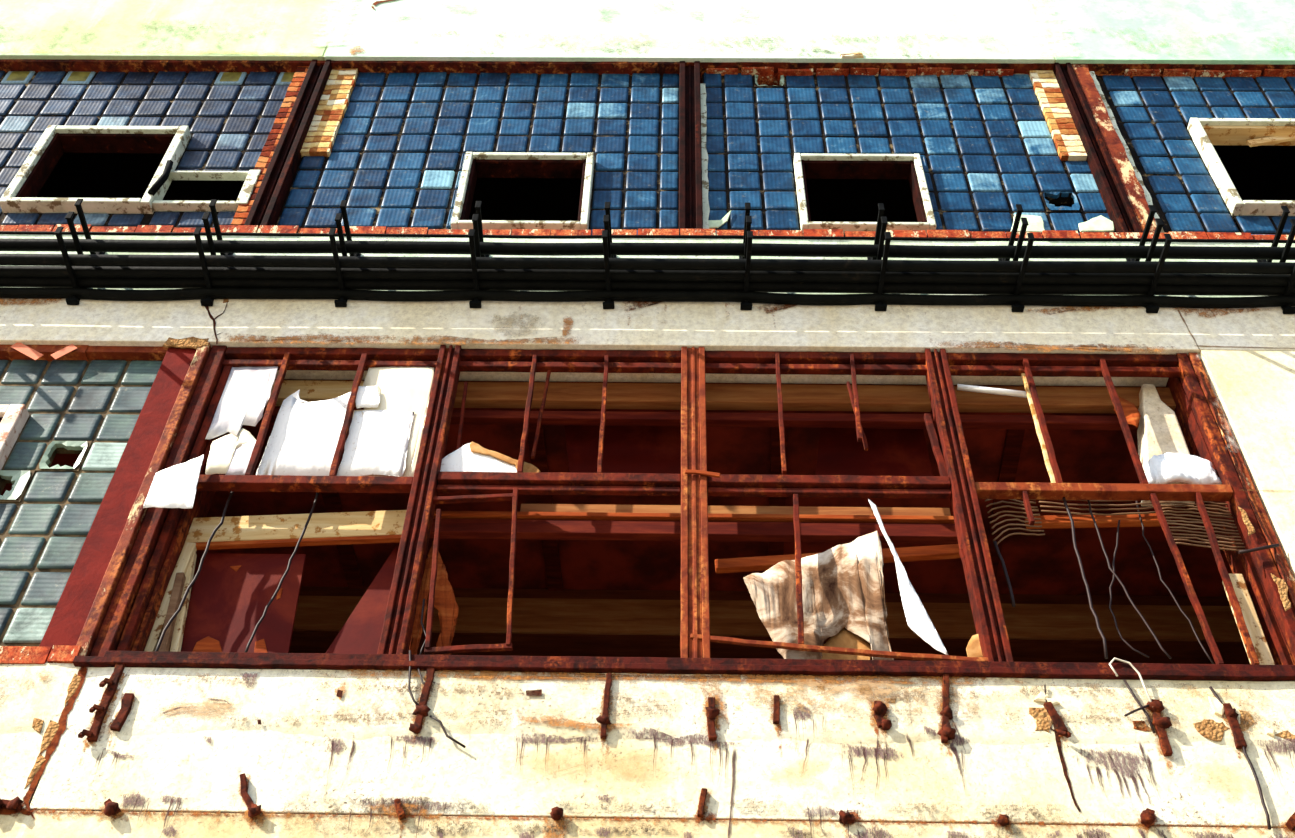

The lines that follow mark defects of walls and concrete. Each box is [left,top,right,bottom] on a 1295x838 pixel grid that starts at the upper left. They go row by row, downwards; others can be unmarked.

corrosion [80,672,135,760]
damp [326,737,355,789]
damp [335,688,439,770]
damp [514,733,603,769]
corrosion [335,669,985,756]
damp [618,727,740,783]
damp [736,682,990,796]
damp [1077,744,1159,800]
corrosion [41,805,220,829]
damp [121,792,187,837]
corrosion [678,792,737,824]
damp [786,805,893,838]